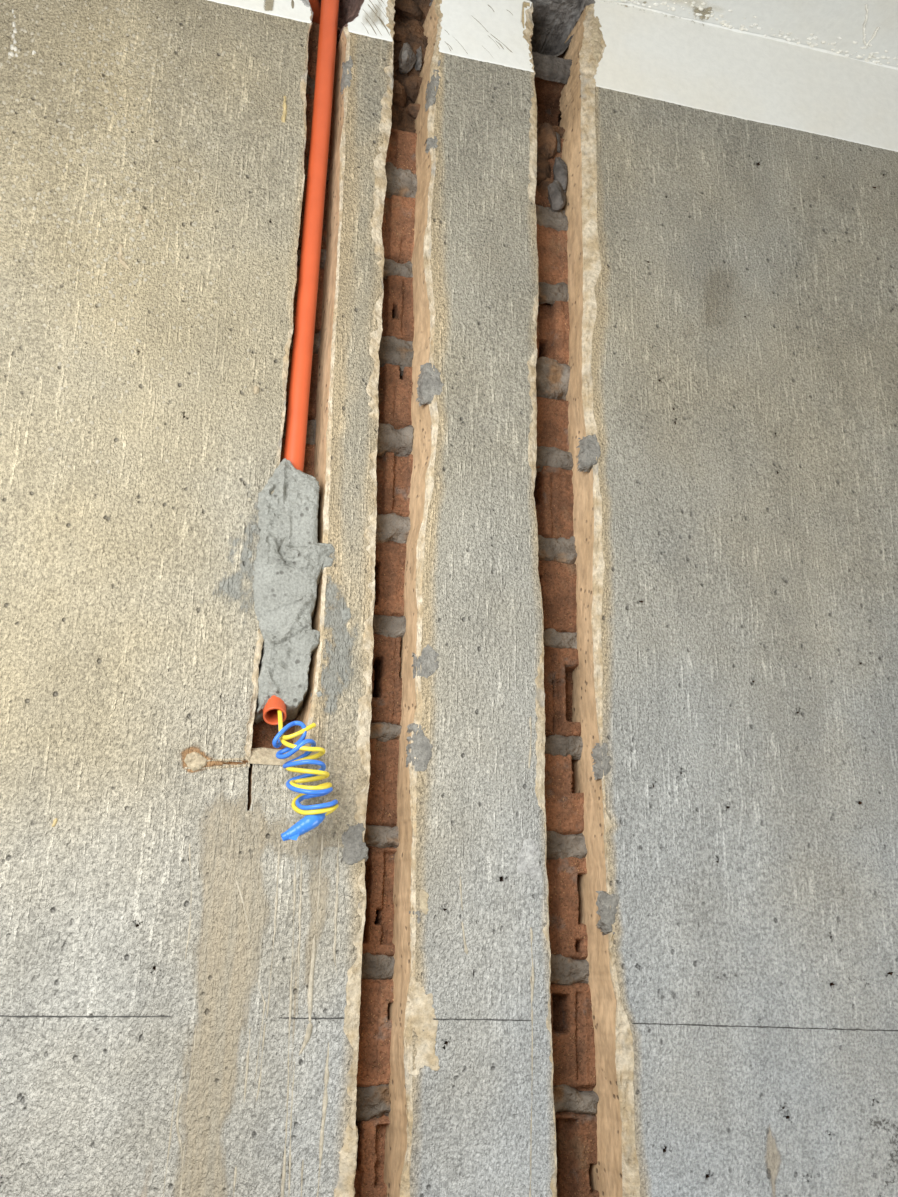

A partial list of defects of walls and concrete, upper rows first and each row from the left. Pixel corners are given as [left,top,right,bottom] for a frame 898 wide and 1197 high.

crack [185,756,253,811]